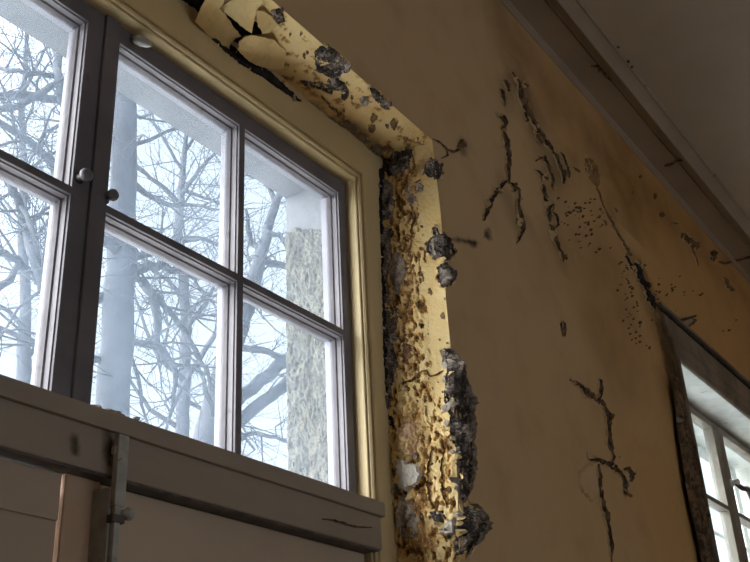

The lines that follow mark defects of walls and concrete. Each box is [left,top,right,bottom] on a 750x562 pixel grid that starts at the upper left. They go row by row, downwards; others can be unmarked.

peeling [182,0,287,72]
spalling [299,43,392,135]
flaking render [378,136,458,411]
crack [432,139,460,159]
crack [481,72,581,263]
crack [595,186,657,311]
crack [322,519,372,528]
spalling [387,338,488,562]
crack [569,375,637,562]
damp [650,278,716,562]